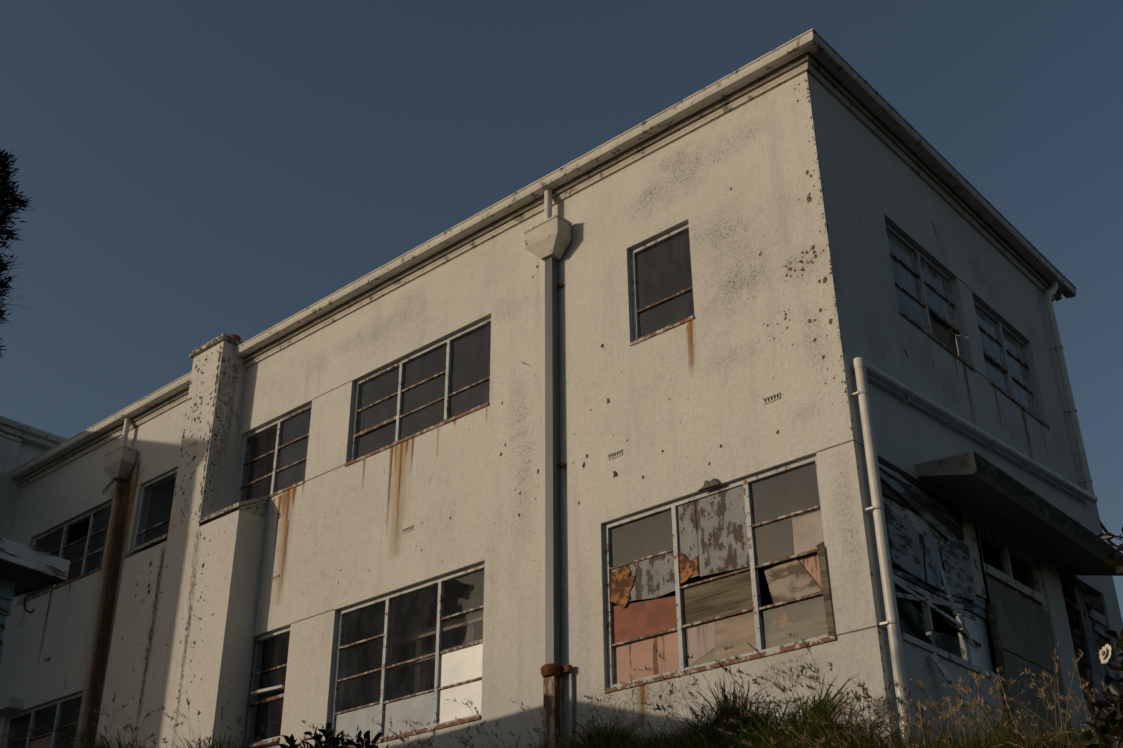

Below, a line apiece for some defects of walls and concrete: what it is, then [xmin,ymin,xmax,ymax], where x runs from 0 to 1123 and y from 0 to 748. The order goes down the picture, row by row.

spalling [782,78,855,438]
spalling [170,342,231,527]
rust [273,487,303,553]
rust [389,437,414,488]